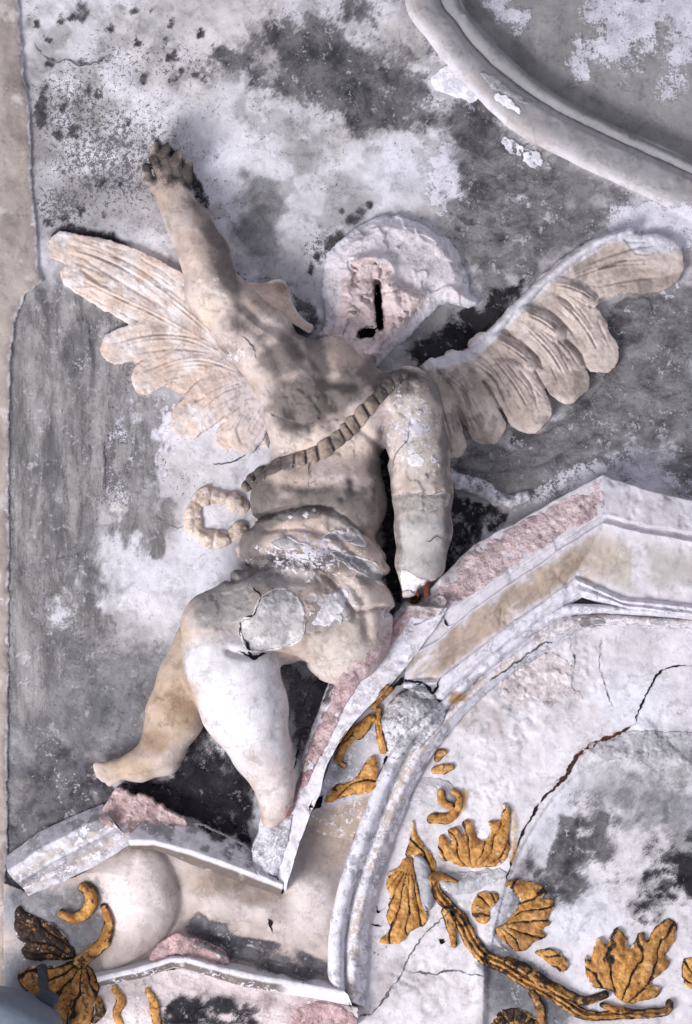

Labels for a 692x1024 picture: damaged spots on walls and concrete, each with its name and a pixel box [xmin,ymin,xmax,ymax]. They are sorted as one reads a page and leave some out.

damp [57,3,90,25]
damp [129,8,198,87]
damp [197,28,250,71]
peeling [423,65,478,108]
peeling [494,136,552,170]
crack [239,584,274,660]
peeling [240,587,356,654]
spalling [283,479,606,821]
crack [491,636,612,706]
crack [506,665,685,881]
spalling [100,786,189,834]
damp [546,816,579,877]